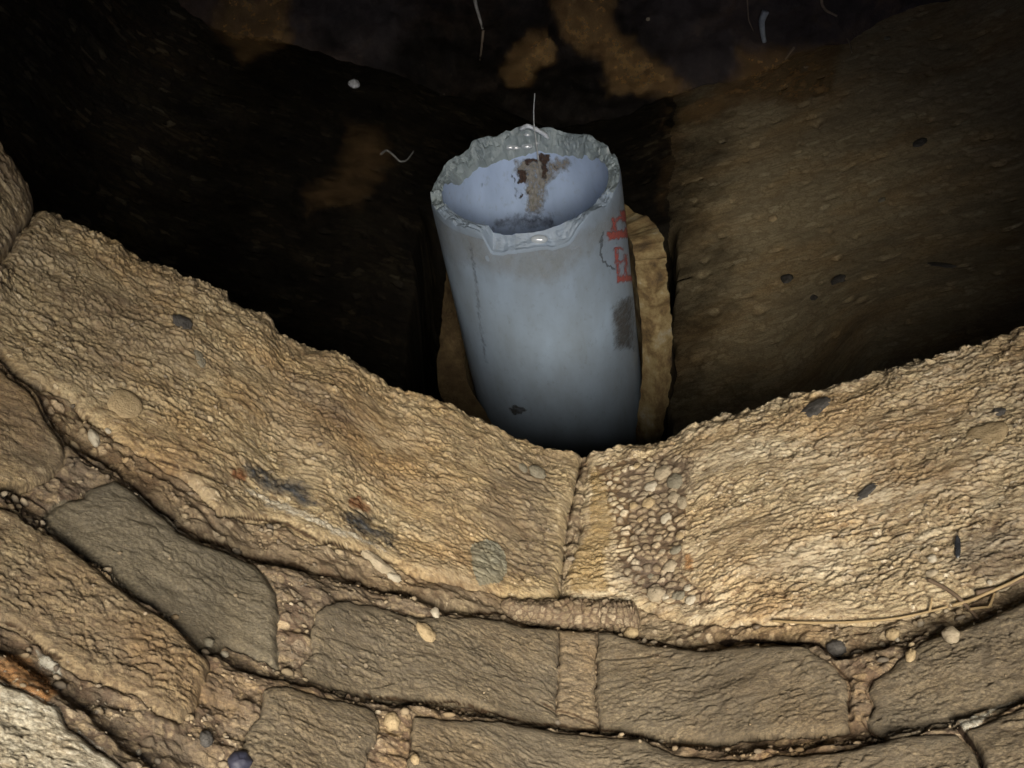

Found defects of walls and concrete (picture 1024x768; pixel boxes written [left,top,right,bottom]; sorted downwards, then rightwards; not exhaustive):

water stain [159,0,716,402]